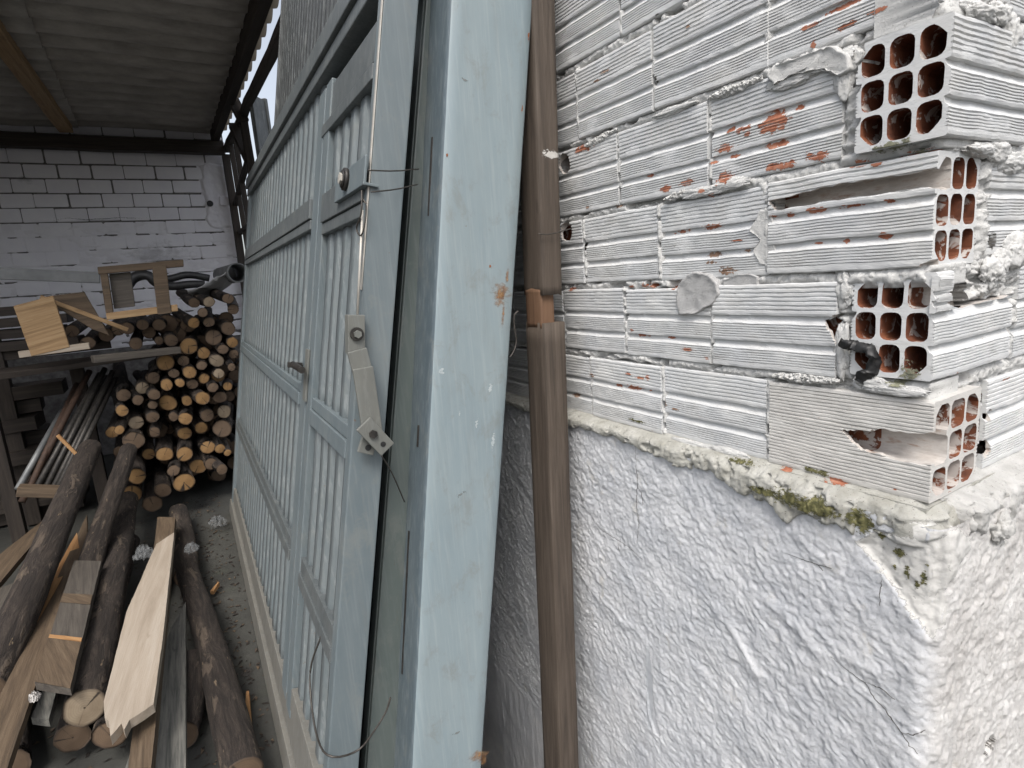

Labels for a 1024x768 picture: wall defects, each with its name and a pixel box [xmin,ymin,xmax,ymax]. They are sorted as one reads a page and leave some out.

peeling [660,104,804,201]
peeling [766,151,829,171]